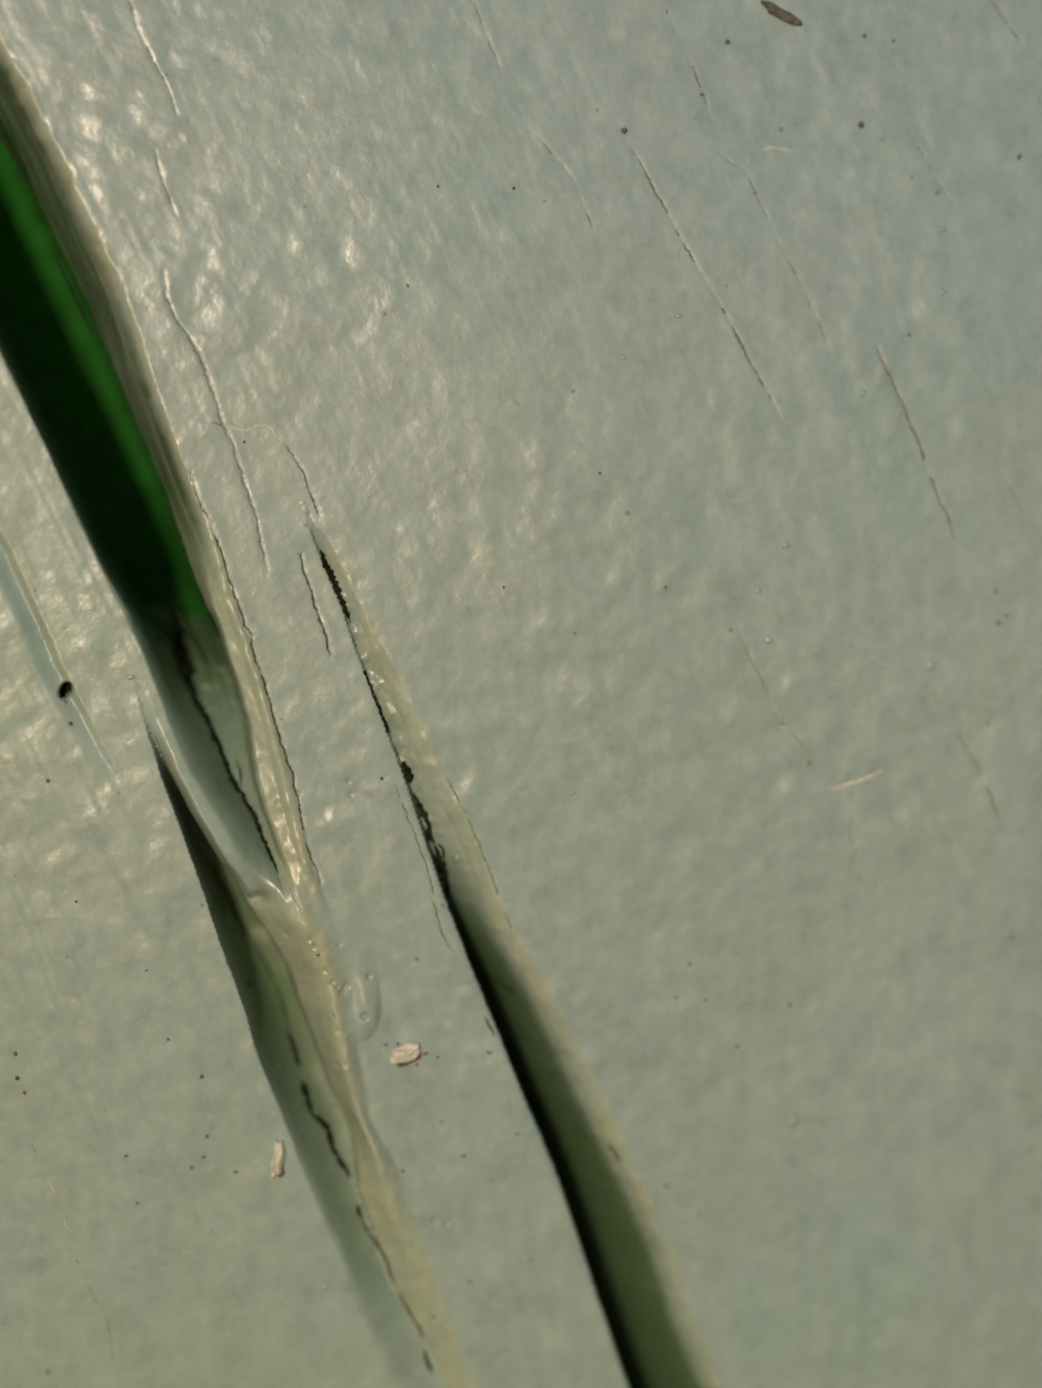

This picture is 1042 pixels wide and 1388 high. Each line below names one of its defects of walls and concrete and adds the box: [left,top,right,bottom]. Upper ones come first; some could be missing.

crack [128,1,176,113]
crack [633,150,695,262]
crack [726,146,795,218]
crack [722,308,772,400]
crack [0,33,321,934]
crack [163,276,723,1388]